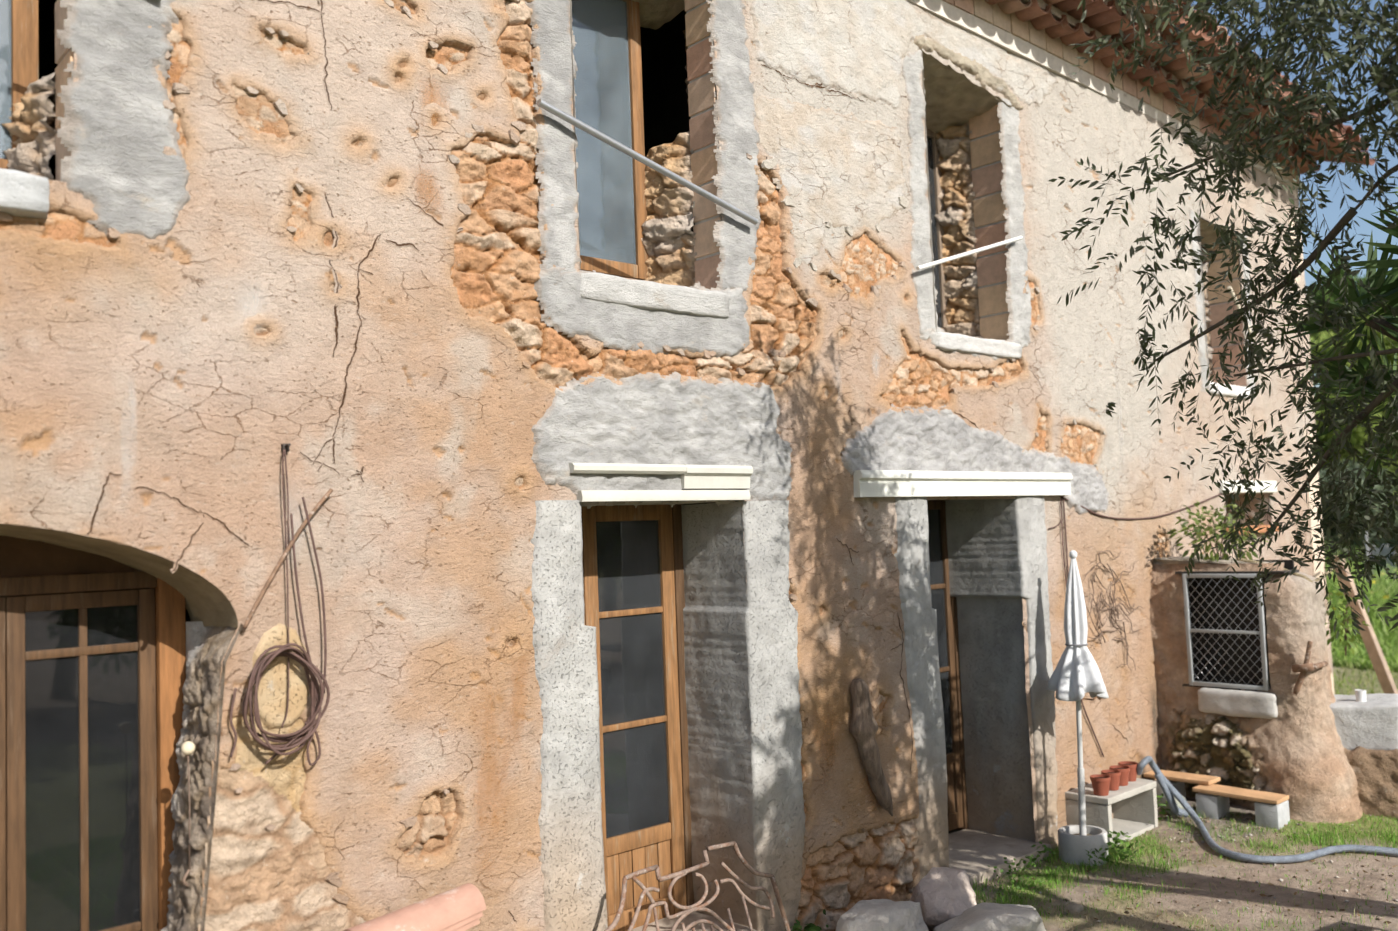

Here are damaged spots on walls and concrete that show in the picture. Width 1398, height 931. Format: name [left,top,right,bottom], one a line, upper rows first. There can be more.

crack [253,0,333,111]
spalling [383,0,415,18]
hole [426,41,468,74]
spalling [232,85,293,144]
spalling [448,0,909,388]
crack [299,184,463,483]
spalling [880,334,1033,413]
spalling [1021,412,1105,467]
crack [86,471,250,574]
spalling [198,715,366,931]
spalling [397,789,457,859]
spalling [794,763,918,931]